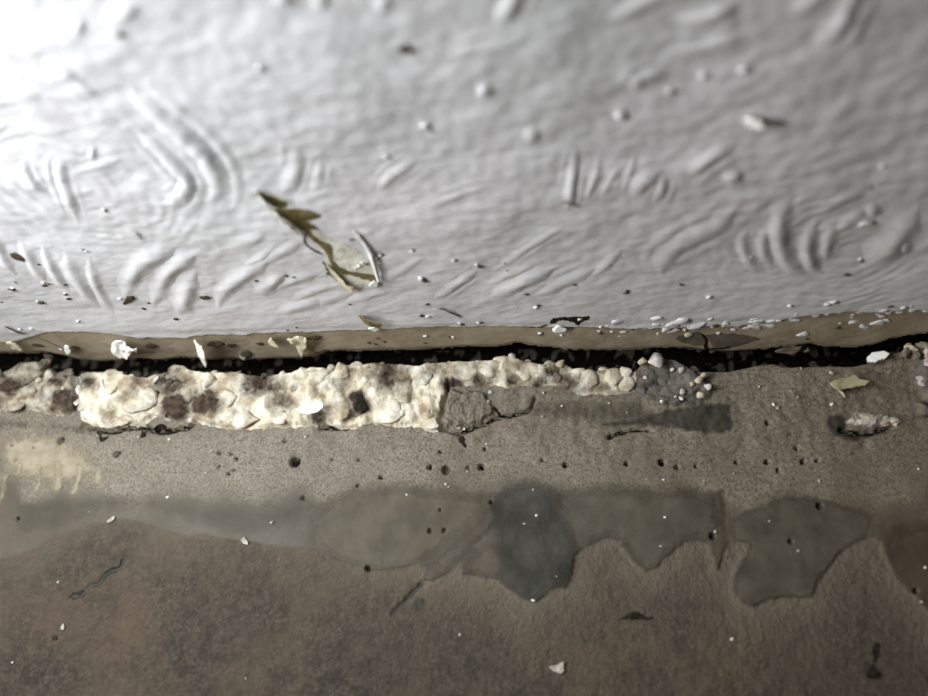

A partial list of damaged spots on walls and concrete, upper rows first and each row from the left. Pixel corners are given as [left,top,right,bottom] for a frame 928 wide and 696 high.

peeling [253,190,384,292]
crack [0,333,928,378]
spalling [0,309,928,433]
crack [70,557,134,600]
damp [313,484,869,607]
damp [886,526,928,610]